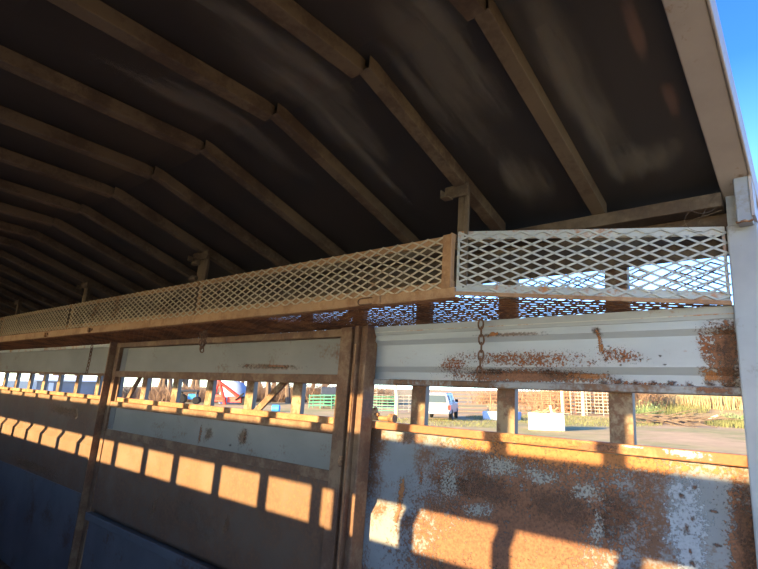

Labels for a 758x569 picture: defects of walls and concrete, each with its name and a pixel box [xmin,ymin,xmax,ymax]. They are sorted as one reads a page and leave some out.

rust [438,319,740,394]
rust [375,433,757,569]